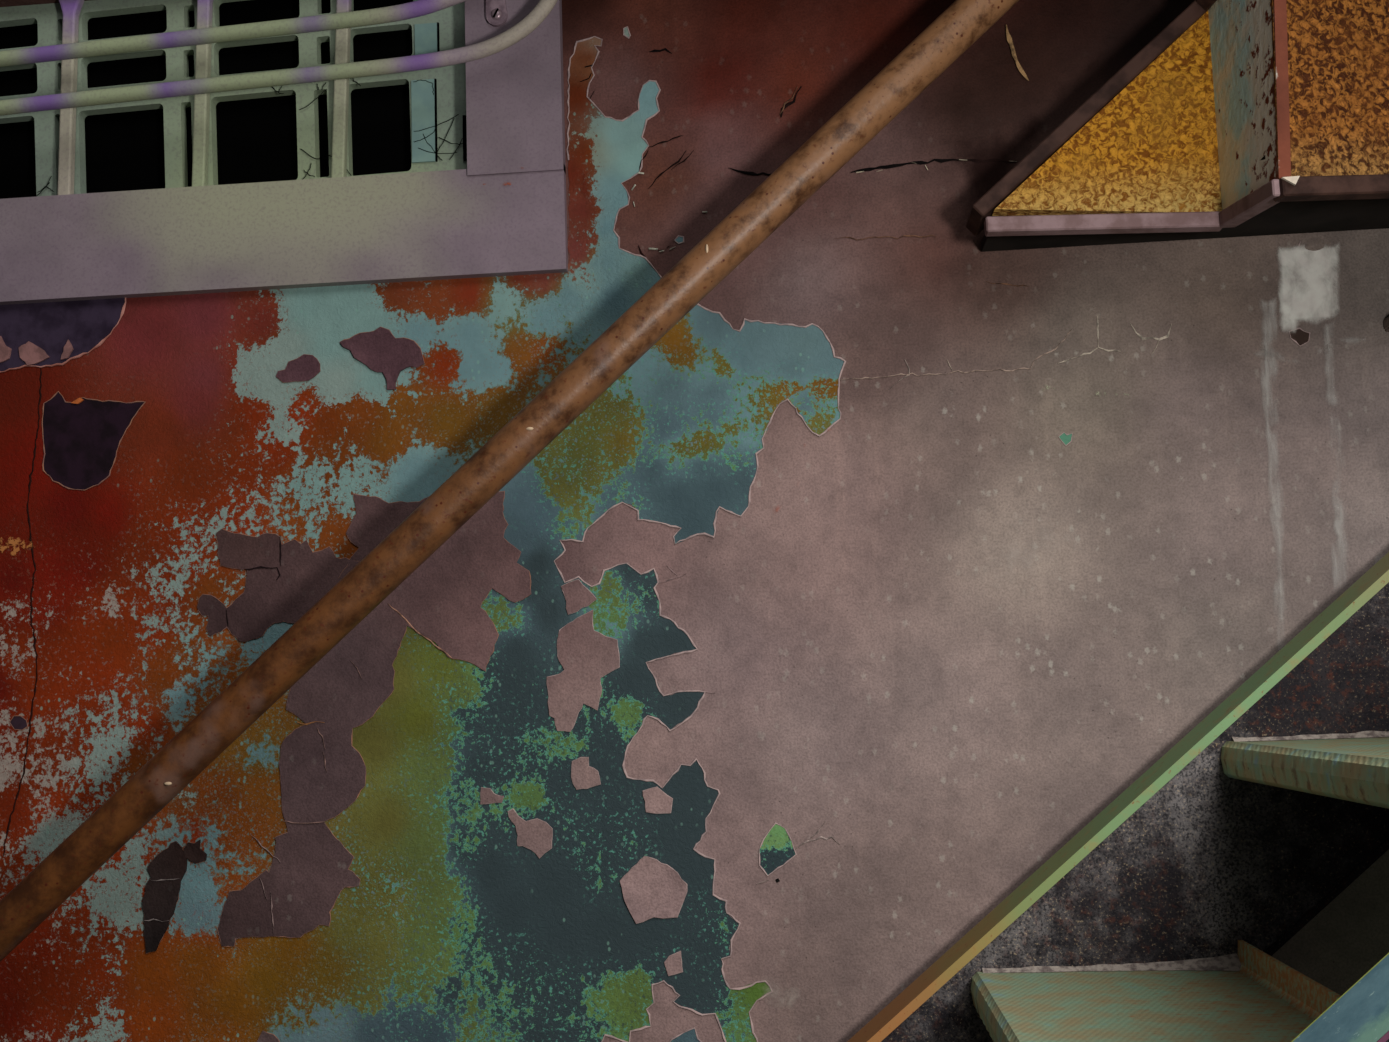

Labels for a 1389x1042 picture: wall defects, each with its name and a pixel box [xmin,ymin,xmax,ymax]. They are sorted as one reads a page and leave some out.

crack [780,86,802,117]
crack [639,135,694,189]
crack [729,168,771,176]
crack [851,159,975,173]
leakage [1272,247,1337,330]
peeling [0,36,662,900]
crack [3,370,42,857]
peeling [0,303,846,1042]